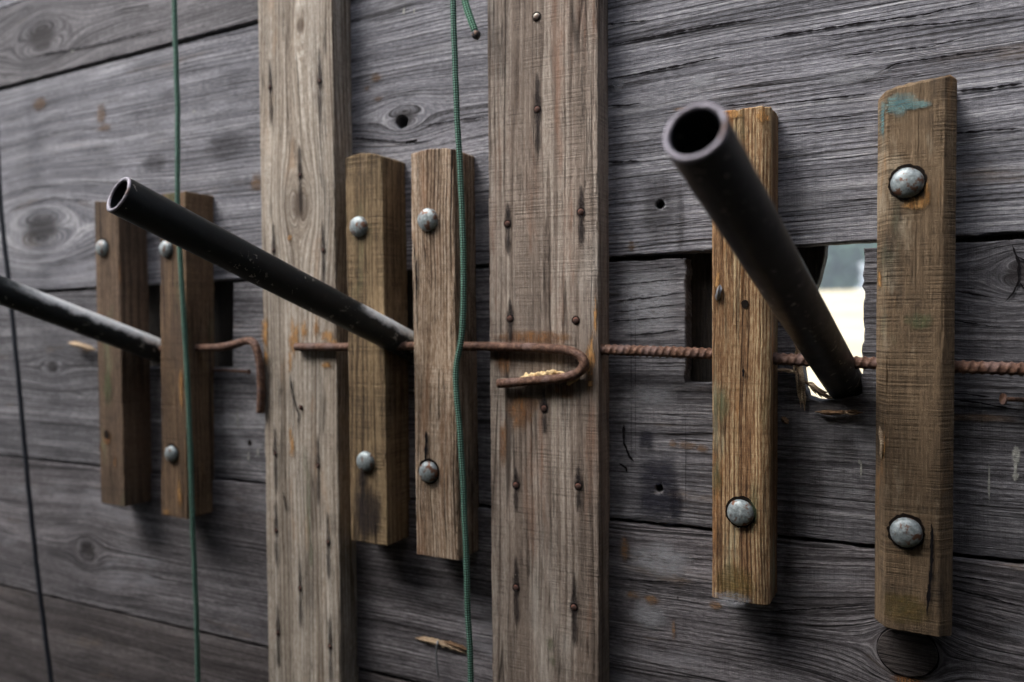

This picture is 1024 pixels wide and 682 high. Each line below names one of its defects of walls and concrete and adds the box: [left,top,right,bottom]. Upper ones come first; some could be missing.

rust [293,343,348,351]
rust [194,337,265,414]
rust [462,331,712,397]
rust [773,352,809,367]
rust [854,356,877,370]
rust [954,359,1024,376]